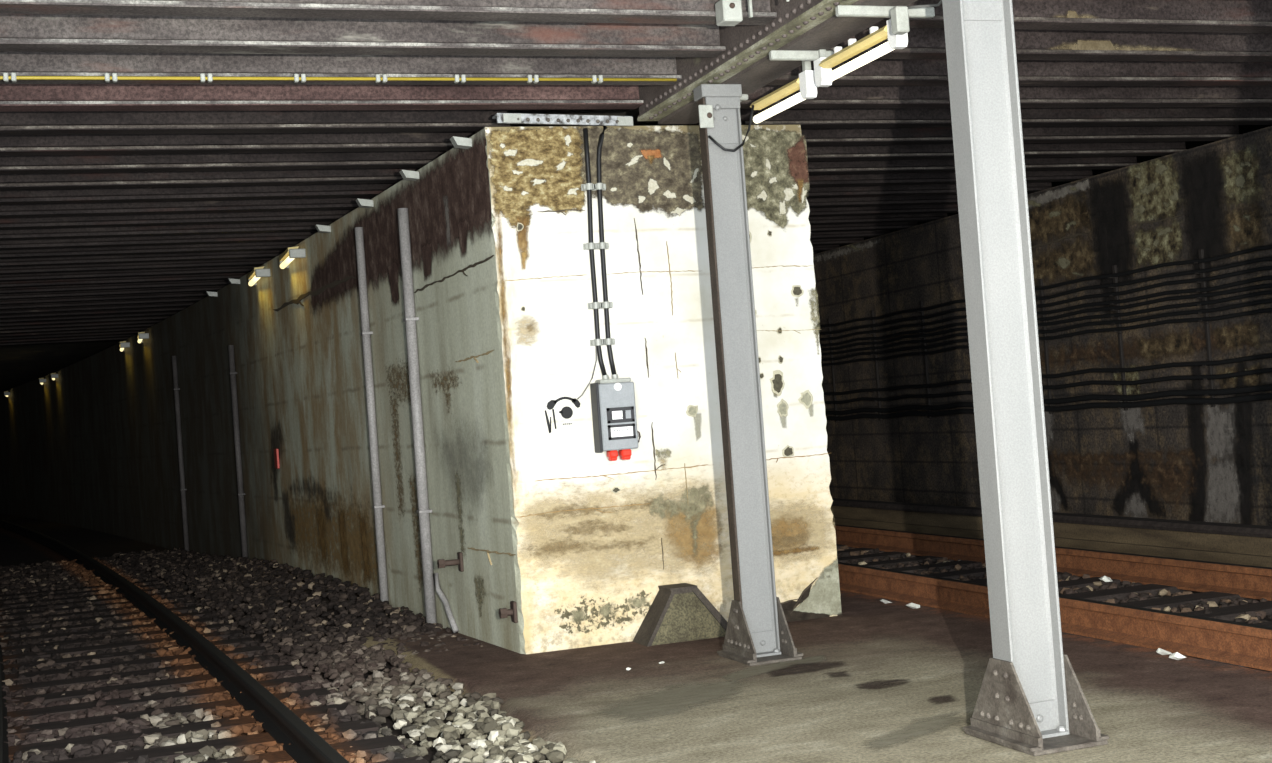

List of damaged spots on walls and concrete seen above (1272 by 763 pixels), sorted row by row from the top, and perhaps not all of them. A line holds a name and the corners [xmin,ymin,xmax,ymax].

peeling [488,126,705,231]
peeling [742,129,810,236]
rust [311,134,512,427]
rust [516,217,529,269]
crack [414,219,695,315]
crack [455,350,494,363]
crack [645,338,681,378]
water stain [1048,453,1068,510]
water stain [1113,441,1165,516]
water stain [1186,366,1208,522]
water stain [1235,362,1253,525]
water stain [522,486,713,578]